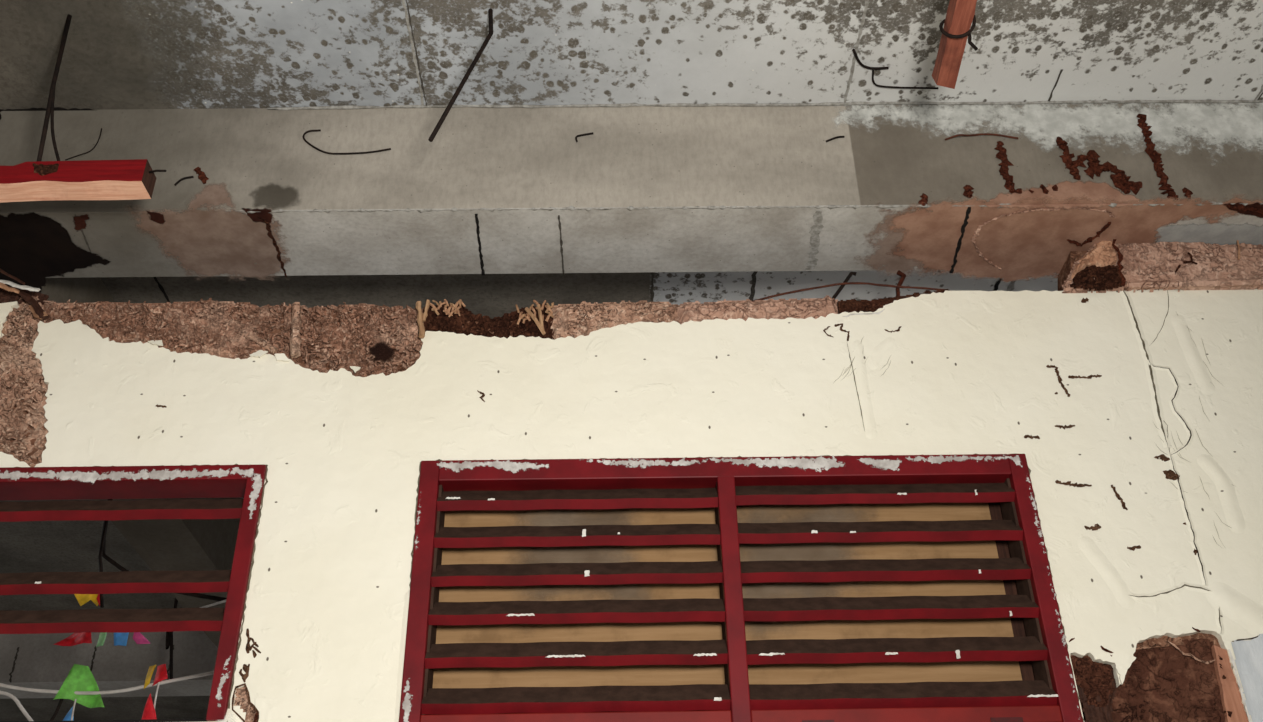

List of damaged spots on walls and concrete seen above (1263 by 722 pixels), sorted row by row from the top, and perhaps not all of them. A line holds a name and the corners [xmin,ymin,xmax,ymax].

efflorescence [834,103,1263,156]
water stain [254,184,297,209]
peeling [1125,240,1263,293]
flaking render [0,289,950,519]
peeling [859,454,1049,569]
crack [1120,290,1234,634]
flaking render [1050,584,1263,722]